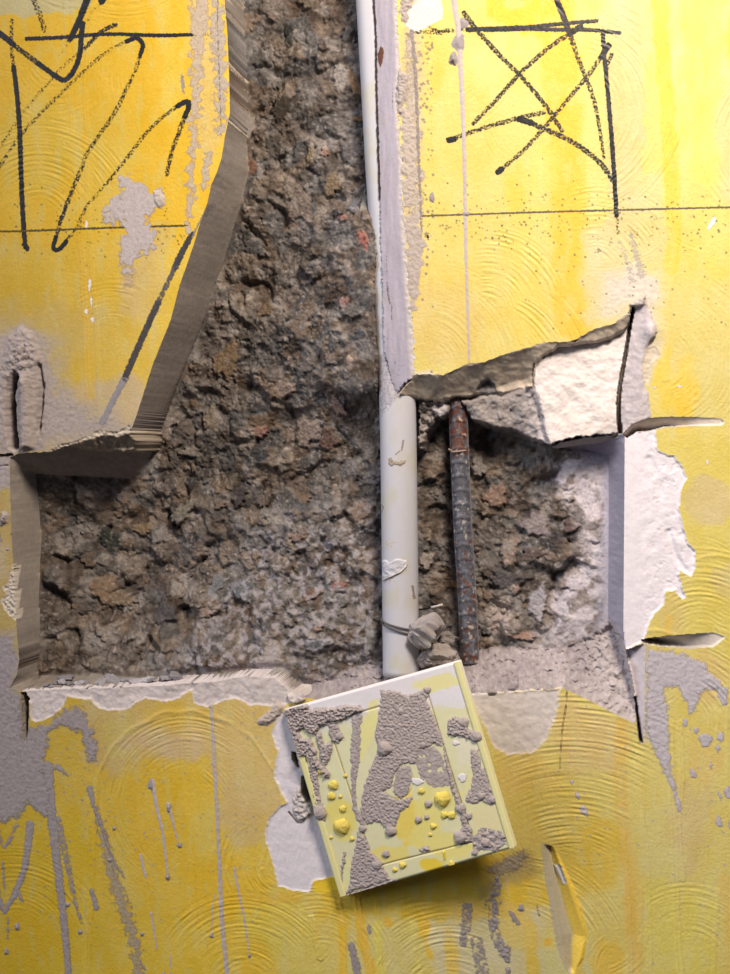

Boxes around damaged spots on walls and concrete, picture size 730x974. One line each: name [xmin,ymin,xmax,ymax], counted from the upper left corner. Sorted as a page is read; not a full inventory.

peeling [153,190,165,209]
spalling [375,0,696,664]
crack [615,306,635,435]
spalling [49,424,163,454]
spalling [1,563,24,621]
peeling [471,687,561,756]
spalling [22,669,334,893]